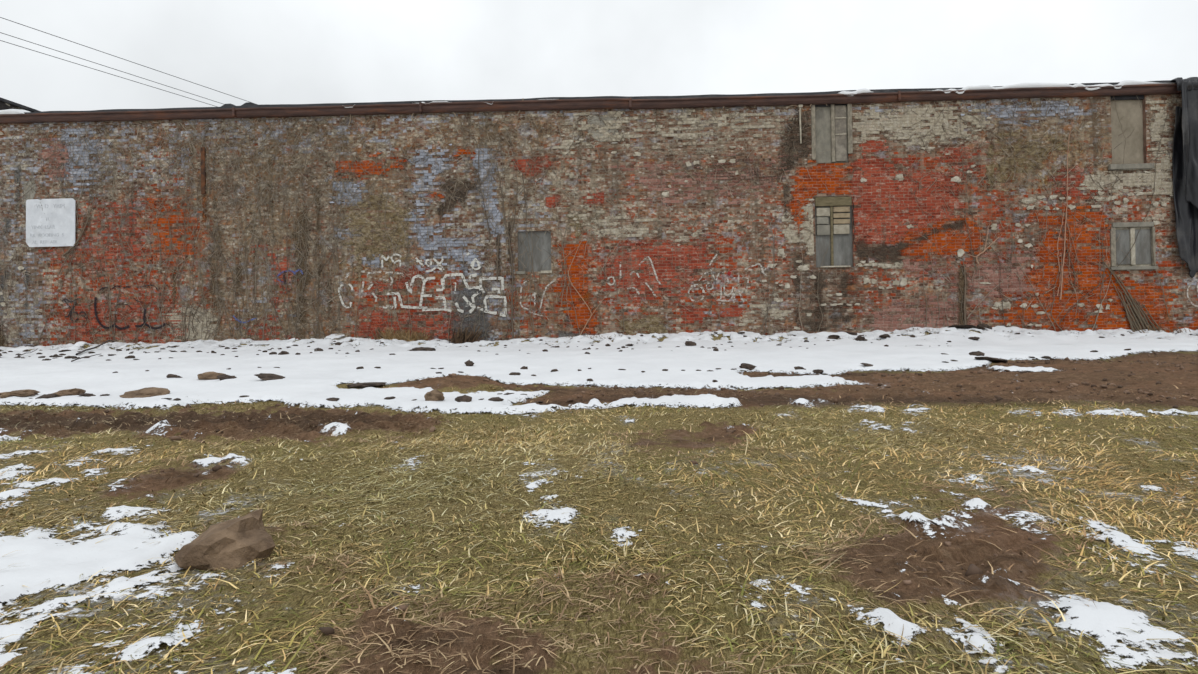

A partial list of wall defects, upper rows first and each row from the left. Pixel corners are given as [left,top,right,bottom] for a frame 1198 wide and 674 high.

peeling [50,128,105,193]
spalling [38,189,219,344]